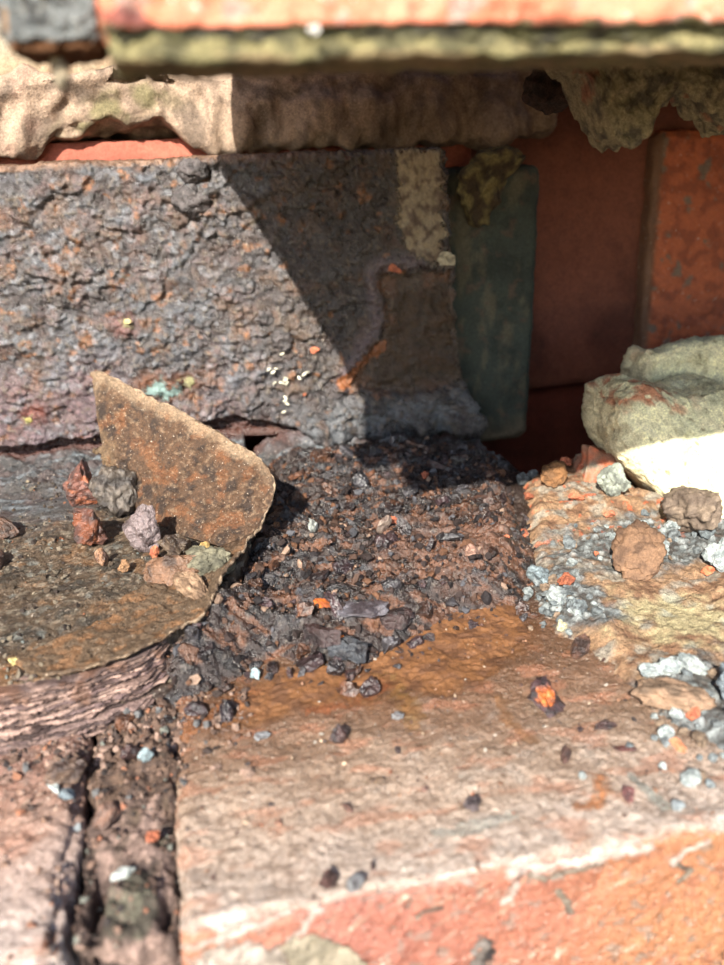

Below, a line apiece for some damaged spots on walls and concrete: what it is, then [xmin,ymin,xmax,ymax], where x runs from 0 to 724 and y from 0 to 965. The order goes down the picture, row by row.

peeling [134,373,197,400]
rust [180,602,535,740]
crack [73,837,111,965]